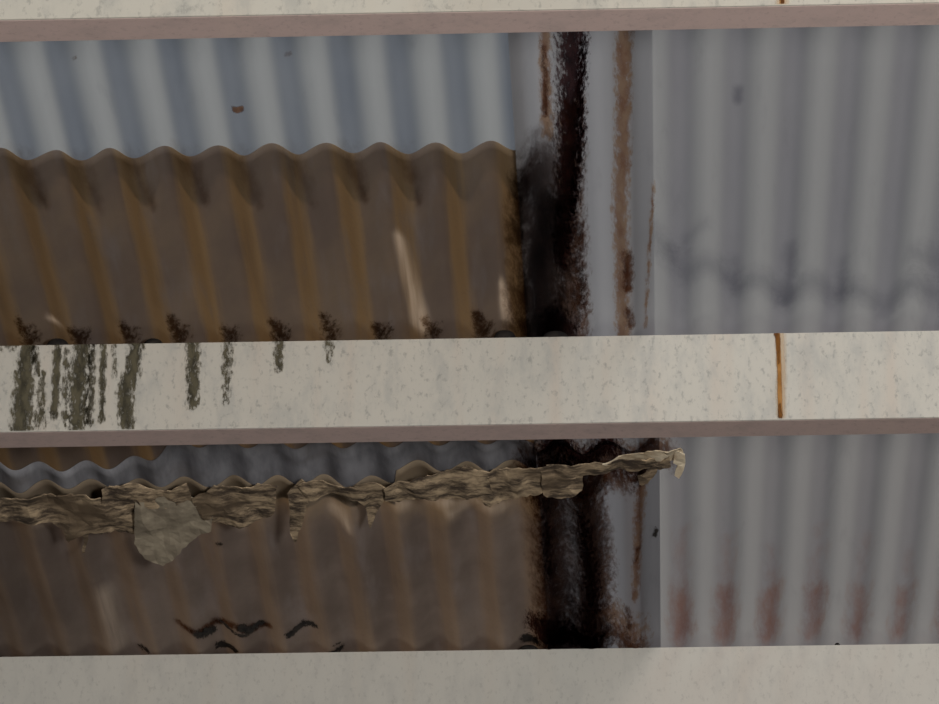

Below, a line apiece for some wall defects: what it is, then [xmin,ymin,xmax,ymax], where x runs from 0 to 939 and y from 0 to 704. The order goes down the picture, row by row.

rust [512,31,589,337]
rust [617,250,634,294]
damp [1,318,145,431]
damp [167,314,201,409]
damp [221,326,237,404]
damp [269,320,291,372]
damp [321,312,339,363]
damp [371,323,394,340]
damp [422,317,440,339]
damp [472,311,491,338]
rust [774,333,785,418]
rust [0,438,685,650]